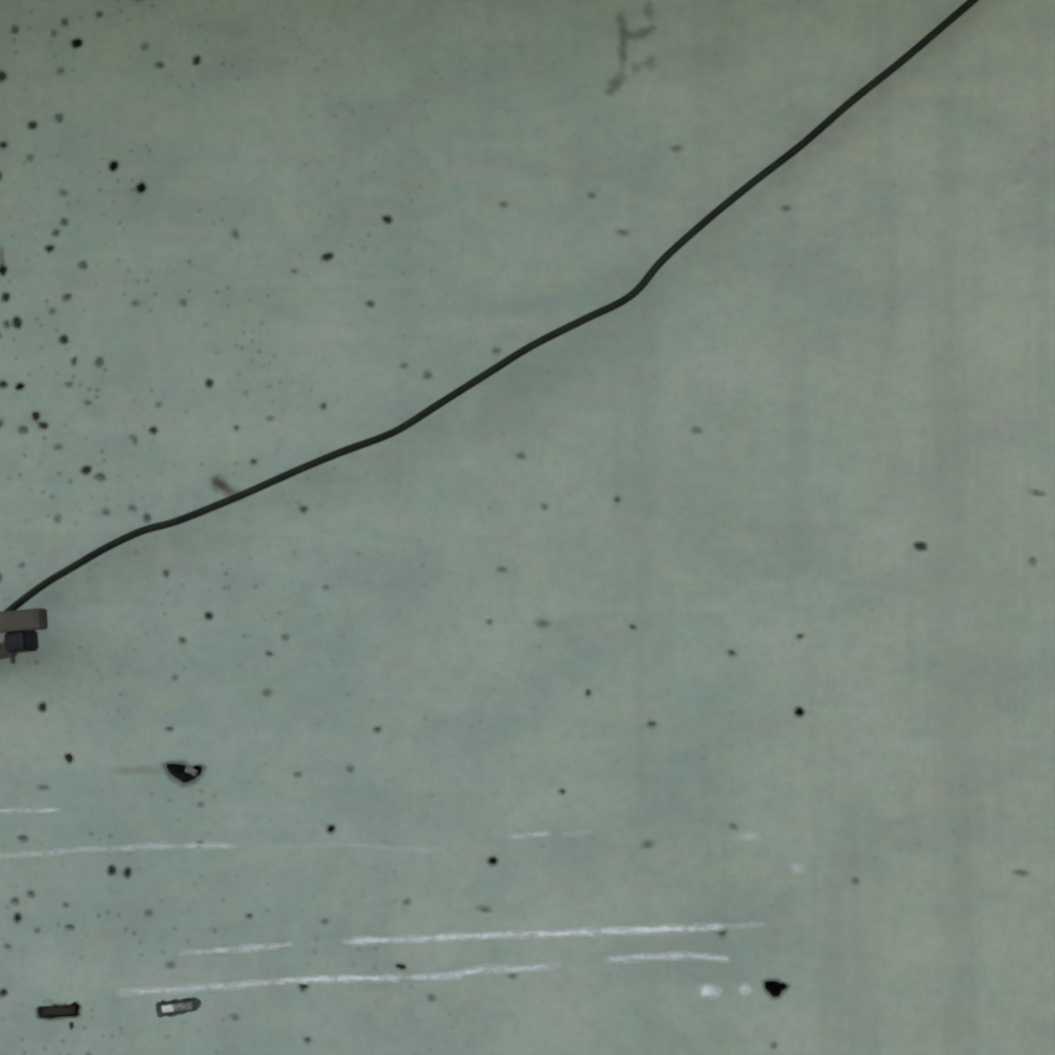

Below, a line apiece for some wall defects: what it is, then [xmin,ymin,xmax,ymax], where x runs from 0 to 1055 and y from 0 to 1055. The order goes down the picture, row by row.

spalling [166,763,202,783]